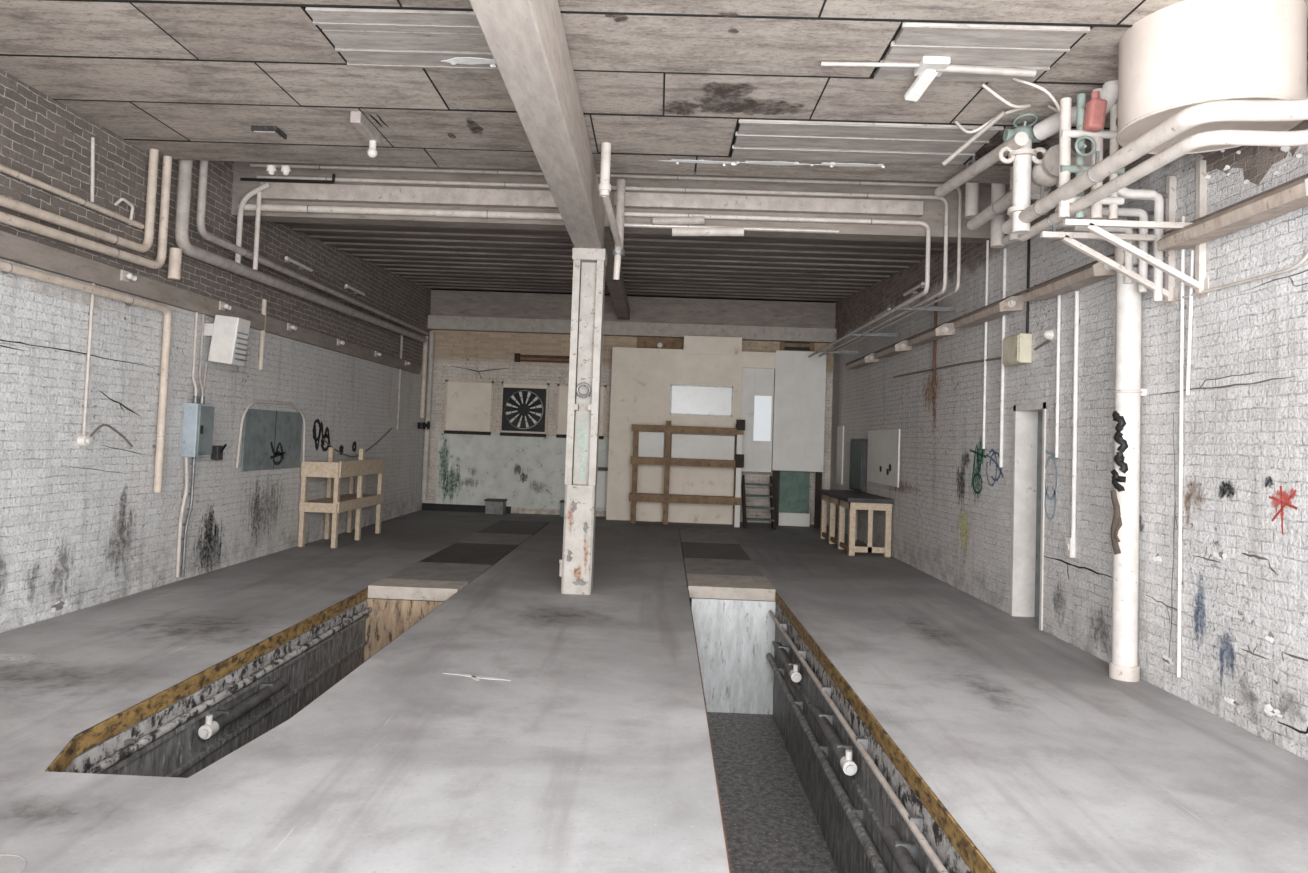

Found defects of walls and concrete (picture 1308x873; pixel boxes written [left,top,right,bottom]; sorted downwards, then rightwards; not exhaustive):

damp [664,82,803,115]
peeling [1197,120,1308,185]
crack [0,339,152,368]
crack [98,390,141,417]
crack [64,445,146,474]
damp [109,498,132,568]